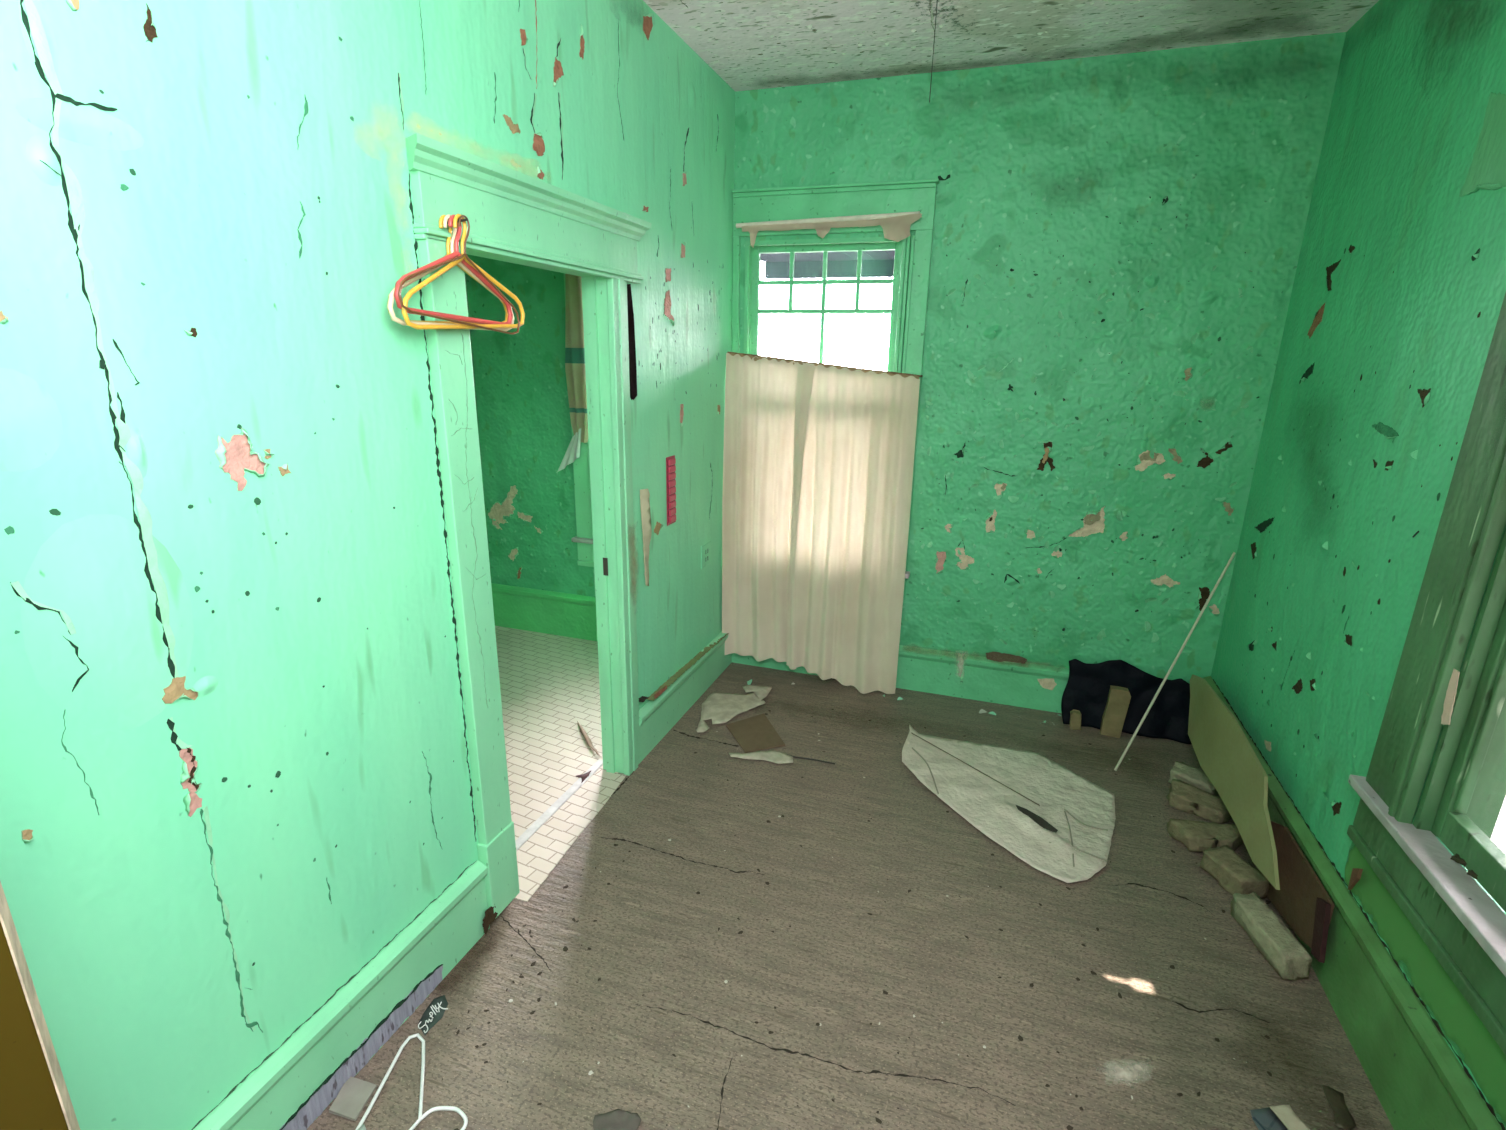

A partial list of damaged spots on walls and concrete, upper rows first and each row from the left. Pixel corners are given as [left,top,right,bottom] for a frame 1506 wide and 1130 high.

crack [20,0,179,678]
peeling [215,424,291,505]
spalling [1037,440,1059,479]
peeling [488,485,543,534]
peeling [915,470,1207,643]
spalling [1198,587,1220,616]
peeling [986,651,1027,663]
crack [10,581,99,815]
spalling [162,676,199,704]
peeling [1037,678,1057,690]
crack [167,717,192,751]
crack [635,1004,1015,1130]